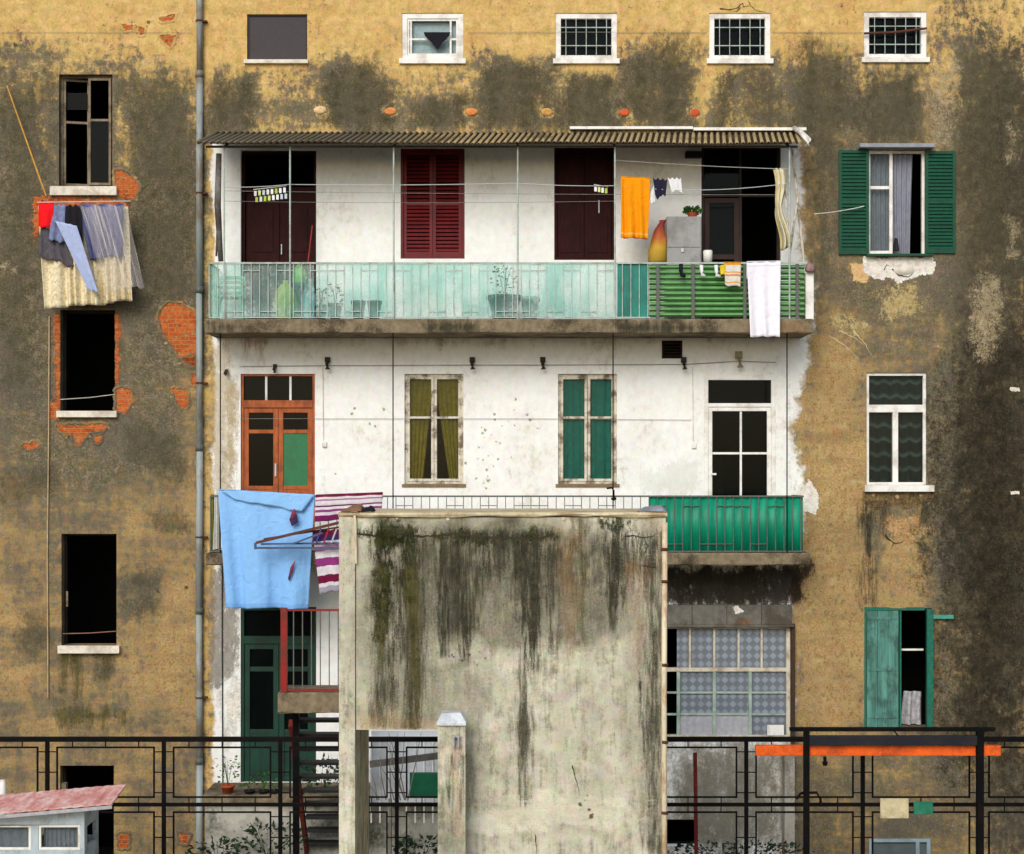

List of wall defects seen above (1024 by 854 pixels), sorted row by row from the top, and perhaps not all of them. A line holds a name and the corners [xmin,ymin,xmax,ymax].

flaking render [119,12,179,51]
flaking render [30,167,142,241]
flaking render [828,256,936,343]
flaking render [47,312,138,448]
flaking render [155,300,196,411]
peeling [797,479,819,515]
leakage [366,529,562,807]
leakage [597,533,662,854]